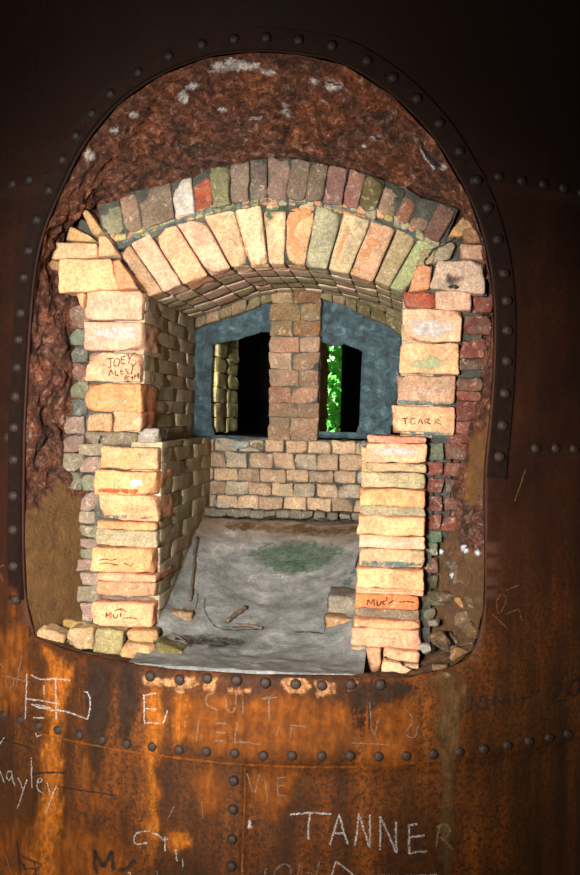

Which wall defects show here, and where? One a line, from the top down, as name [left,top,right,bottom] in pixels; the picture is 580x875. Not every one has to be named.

corrosion [0,627,28,711]
corrosion [0,648,130,875]
water stain [85,662,137,789]
corrosion [111,676,418,875]